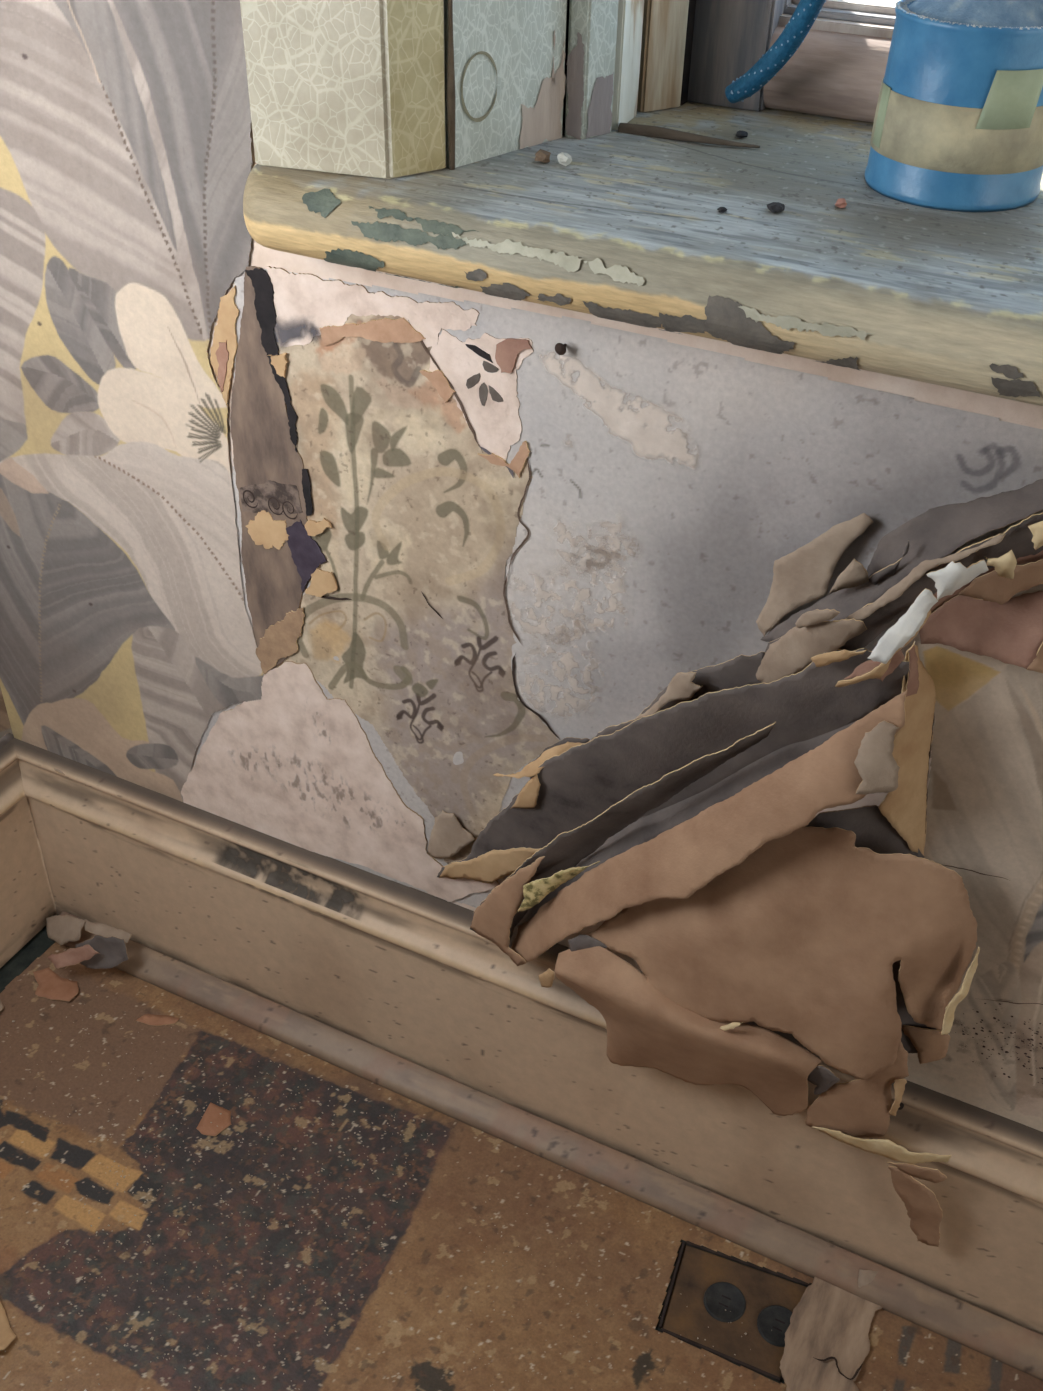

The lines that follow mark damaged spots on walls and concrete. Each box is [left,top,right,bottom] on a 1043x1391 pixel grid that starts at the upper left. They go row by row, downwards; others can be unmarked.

peeling [519,30,614,149]
peeling [302,188,341,218]
flaking render [266,206,871,478]
peeling [989,363,1040,397]
peeling [305,518,332,536]
peeling [305,568,338,597]
flaking render [181,661,500,902]
peeling [217,843,358,913]